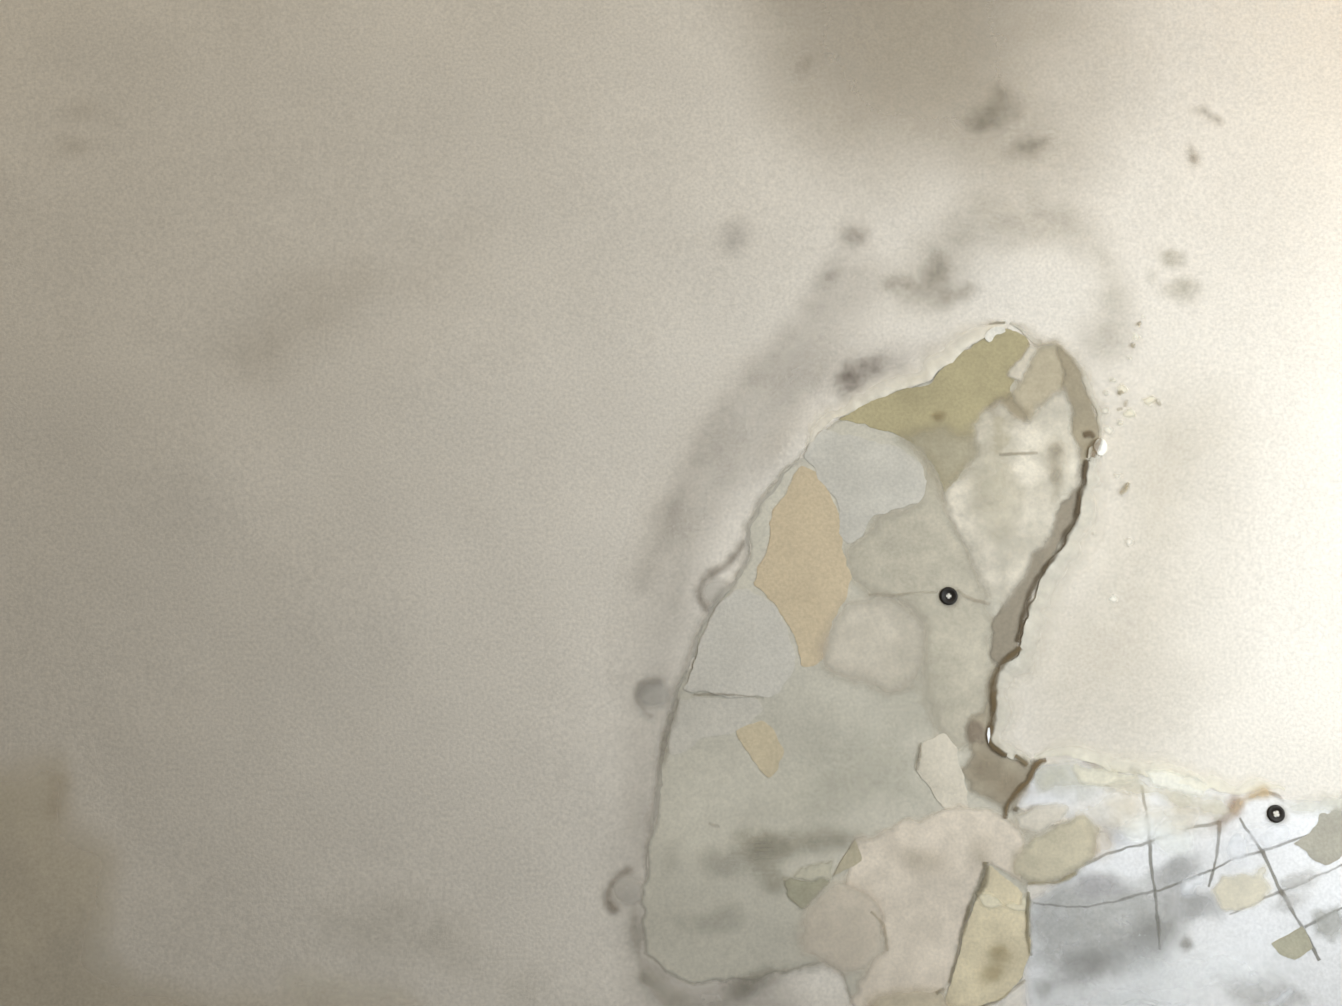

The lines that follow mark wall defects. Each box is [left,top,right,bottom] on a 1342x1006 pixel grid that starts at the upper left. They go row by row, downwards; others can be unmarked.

peeling [642,322,1342,1006]
crack [987,431,1102,819]
crack [1079,785,1342,961]